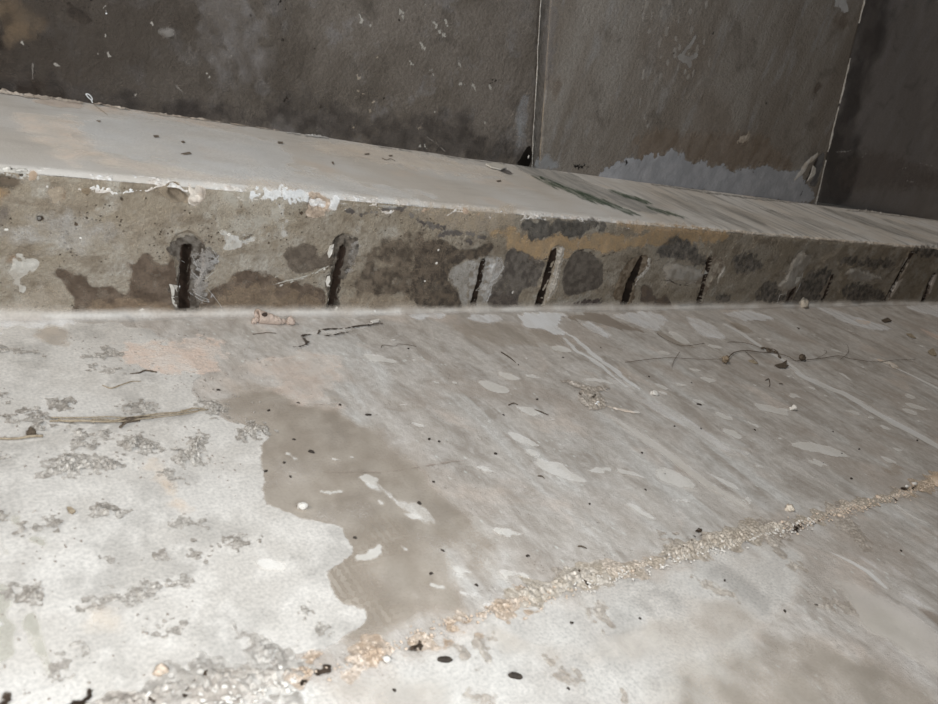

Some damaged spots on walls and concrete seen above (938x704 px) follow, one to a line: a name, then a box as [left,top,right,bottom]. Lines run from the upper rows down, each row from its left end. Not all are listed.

spalling [0,166,289,206]
spalling [299,192,938,315]
spalling [166,235,223,316]
leakage [225,389,492,639]
crack [408,640,423,651]
crack [300,664,331,686]
crack [0,692,11,704]
crack [70,688,92,704]